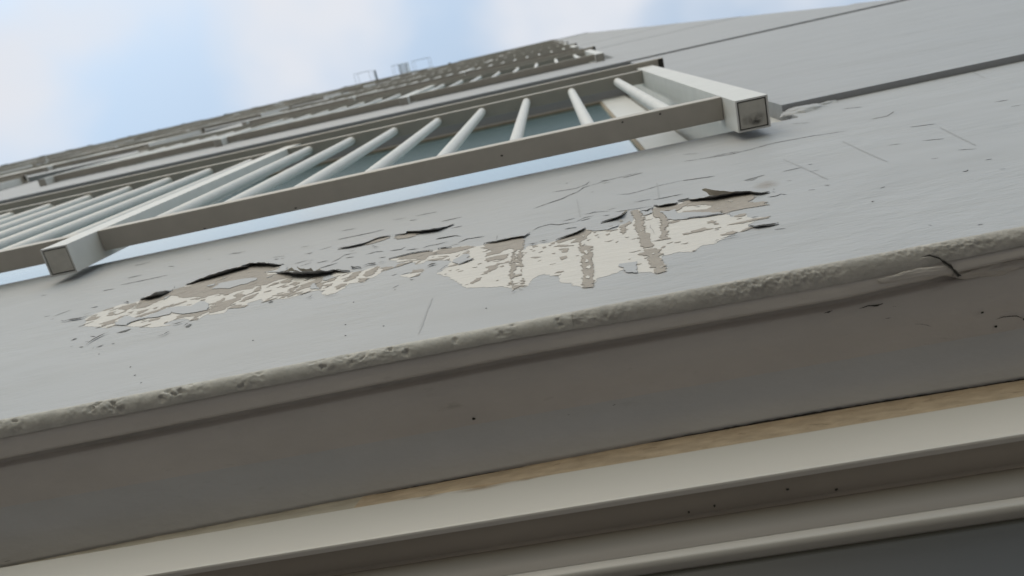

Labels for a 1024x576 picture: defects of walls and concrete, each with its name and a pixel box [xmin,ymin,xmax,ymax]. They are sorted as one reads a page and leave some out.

peeling [62,188,778,347]
spalling [0,224,1024,438]
crack [862,254,1024,308]